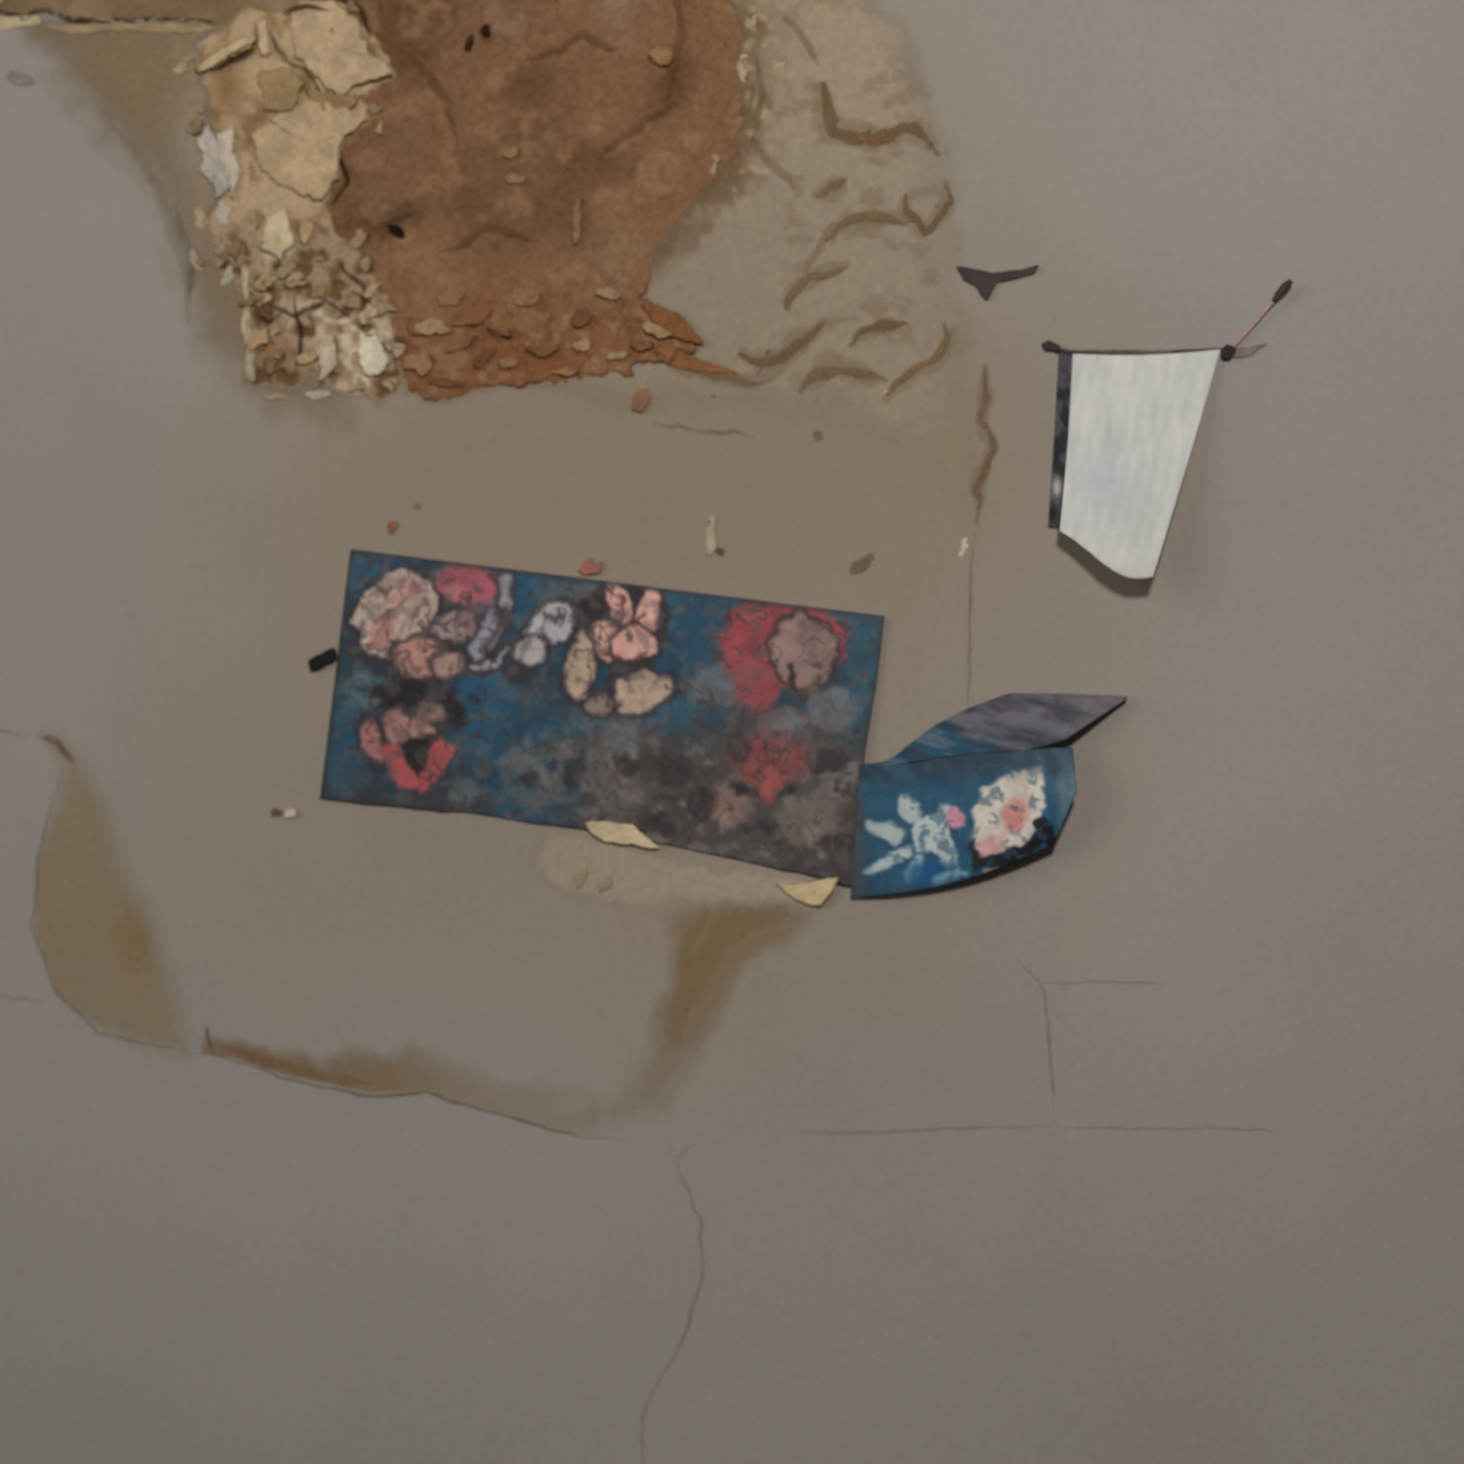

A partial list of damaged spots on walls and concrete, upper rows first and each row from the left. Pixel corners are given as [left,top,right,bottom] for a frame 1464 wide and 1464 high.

spalling [0,0,954,434]
peeling [957,538,968,557]
water stain [38,783,163,1029]